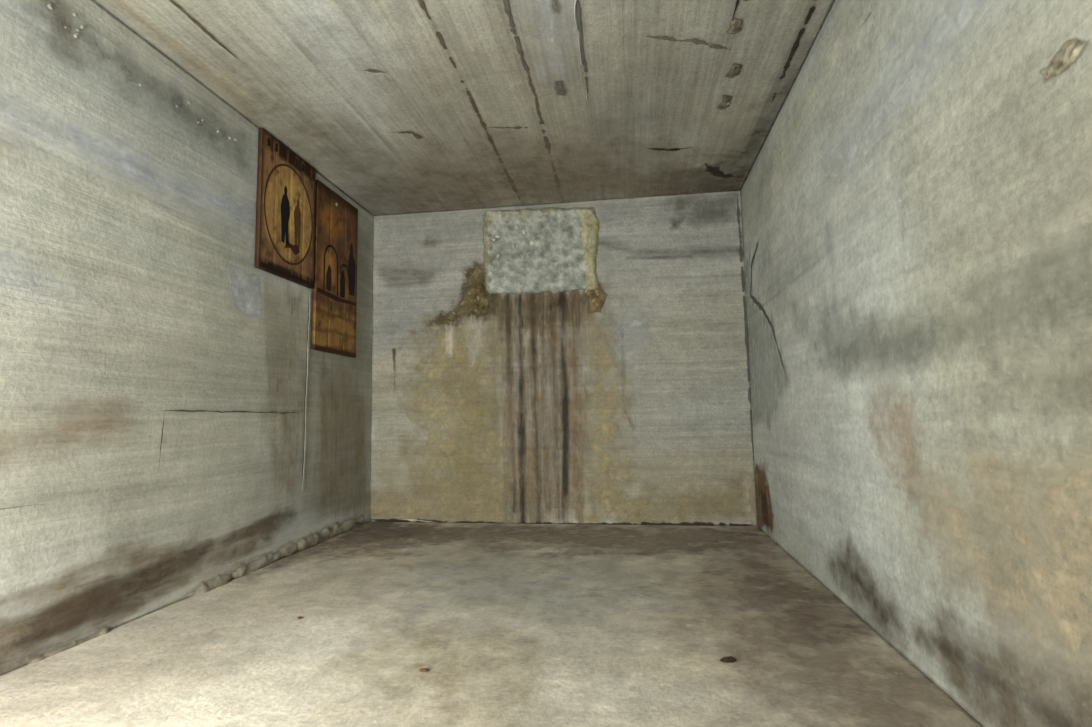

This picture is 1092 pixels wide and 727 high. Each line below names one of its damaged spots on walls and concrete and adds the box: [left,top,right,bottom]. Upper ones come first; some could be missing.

crack [389,131,431,144]
crack [418,0,559,200]
crack [574,0,588,101]
crack [646,36,732,50]
crack [772,6,815,102]
spalling [430,264,496,326]
spalling [586,285,607,312]
leakage [331,313,1092,727]
leakage [0,512,293,673]